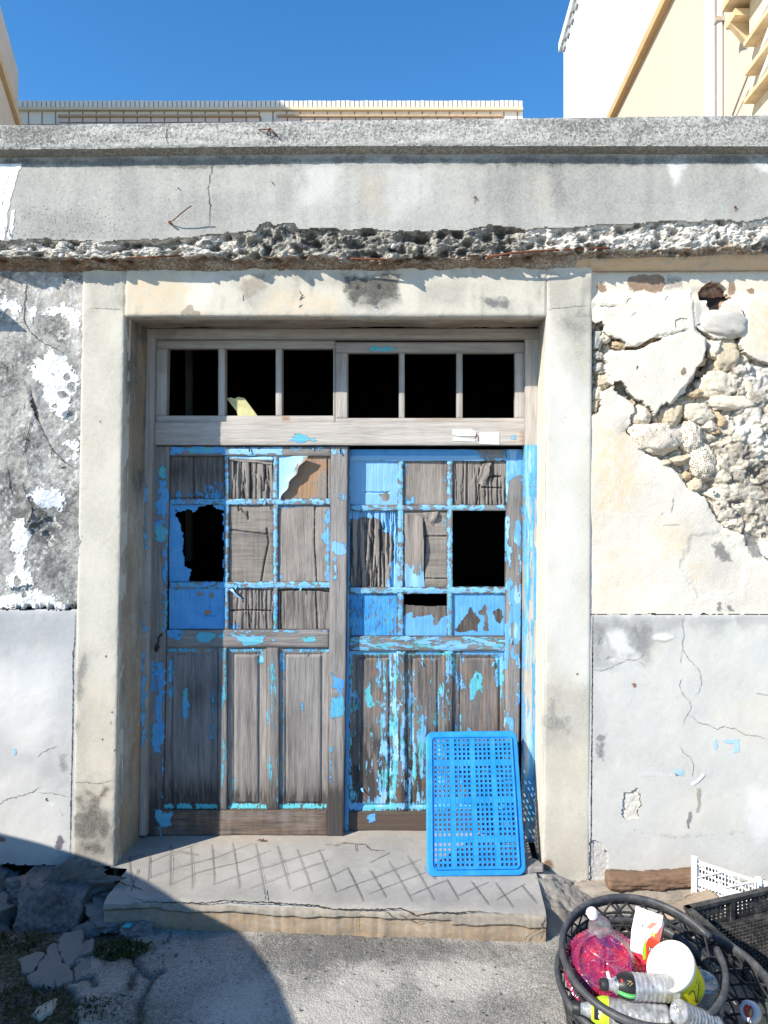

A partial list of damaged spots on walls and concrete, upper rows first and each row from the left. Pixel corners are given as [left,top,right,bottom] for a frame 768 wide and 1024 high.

crack [0,362,75,541]
spalling [0,218,768,546]
peeling [0,518,71,609]
crack [679,621,766,778]
flaking render [621,788,642,819]
crack [115,867,495,930]